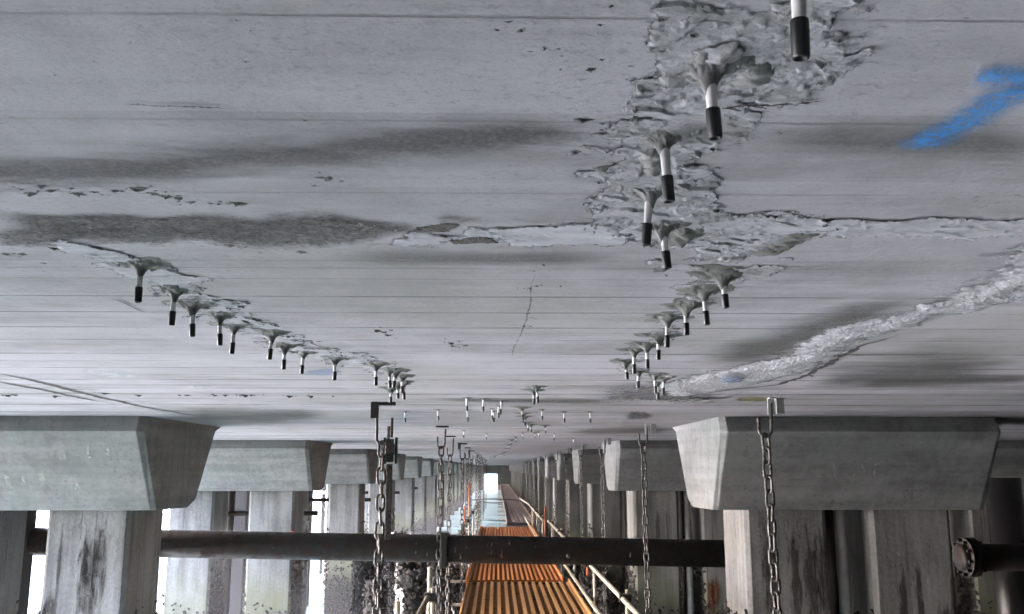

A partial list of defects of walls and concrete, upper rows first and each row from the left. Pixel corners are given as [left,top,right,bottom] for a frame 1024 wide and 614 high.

peeling [692,41,775,89]
peeling [573,115,661,137]
damp [0,128,568,184]
peeling [592,164,616,184]
peeling [638,148,662,178]
spalling [1,183,630,256]
peeling [668,227,705,248]
peeling [747,231,820,257]